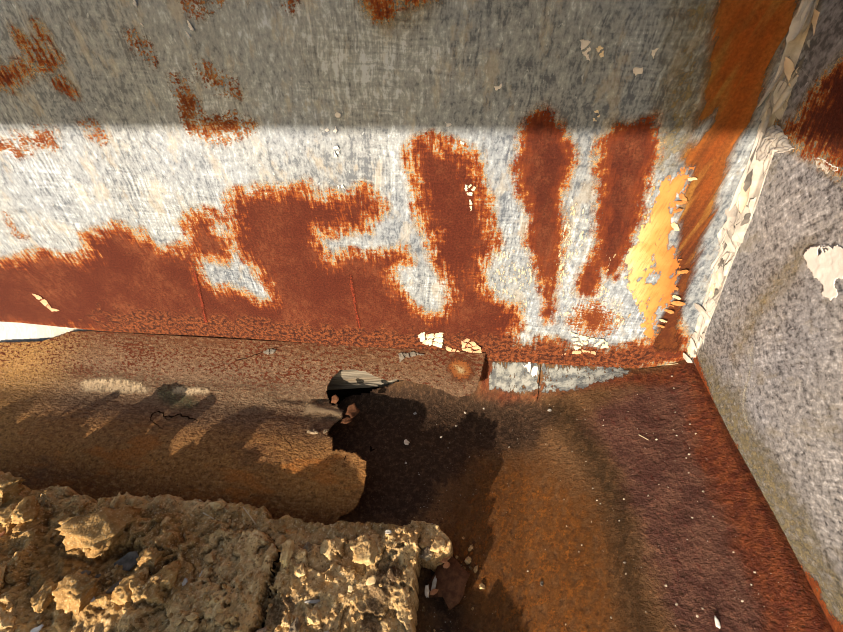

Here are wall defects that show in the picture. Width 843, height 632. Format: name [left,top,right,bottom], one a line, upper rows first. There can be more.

peeling [580,39,604,61]
corrosion [774,50,843,178]
corrosion [0,0,800,400]
peeling [596,0,820,363]
peeling [814,157,838,174]
peeling [803,244,843,301]
peeling [398,332,482,362]
corrosion [428,556,470,610]
corrosion [801,566,843,632]